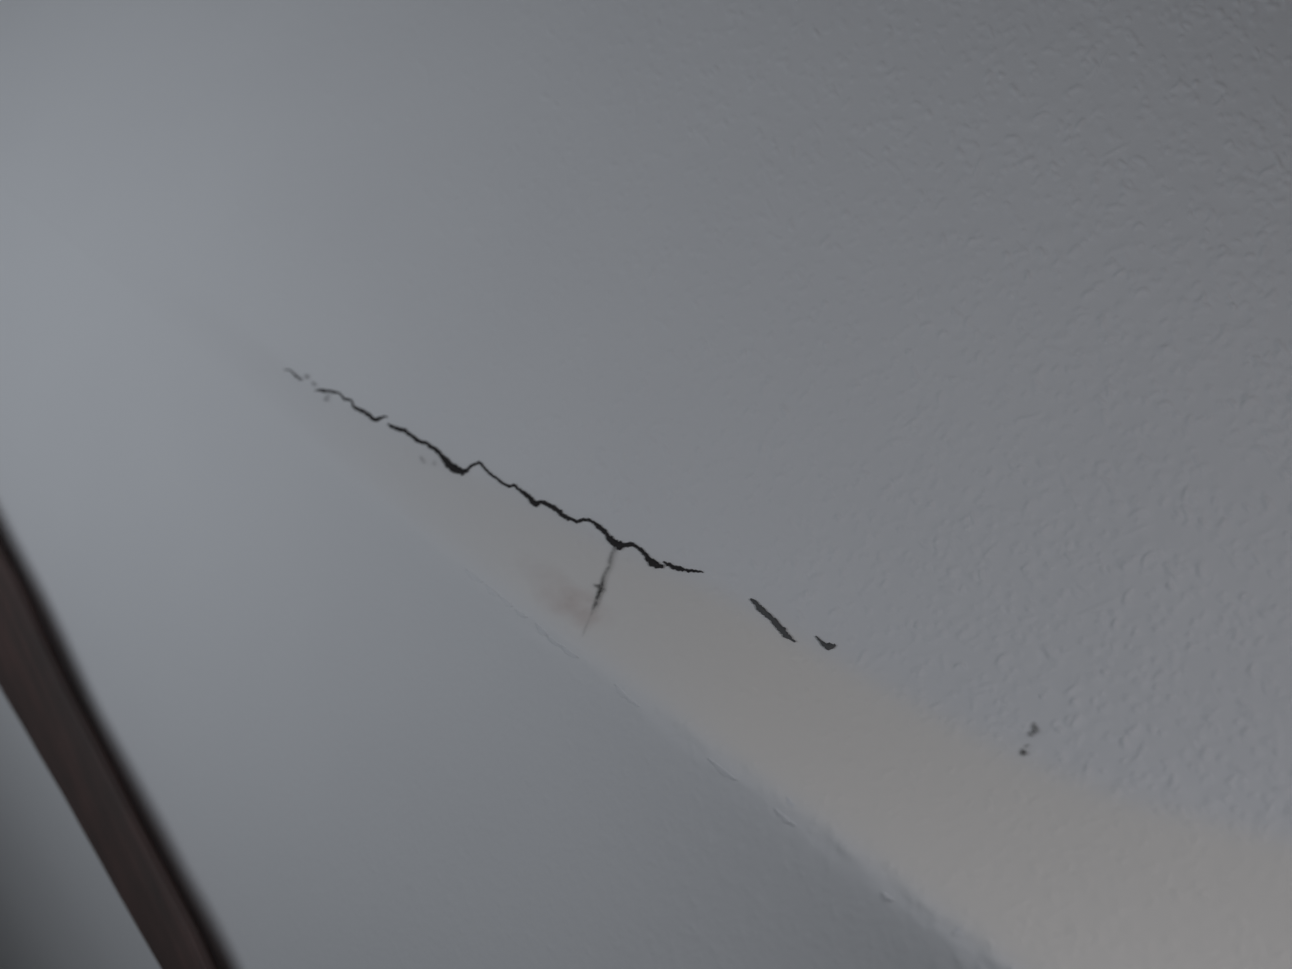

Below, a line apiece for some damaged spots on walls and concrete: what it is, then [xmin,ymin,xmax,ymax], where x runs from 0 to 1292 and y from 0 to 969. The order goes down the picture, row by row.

crack [284,369,703,607]
crack [750,598,836,650]